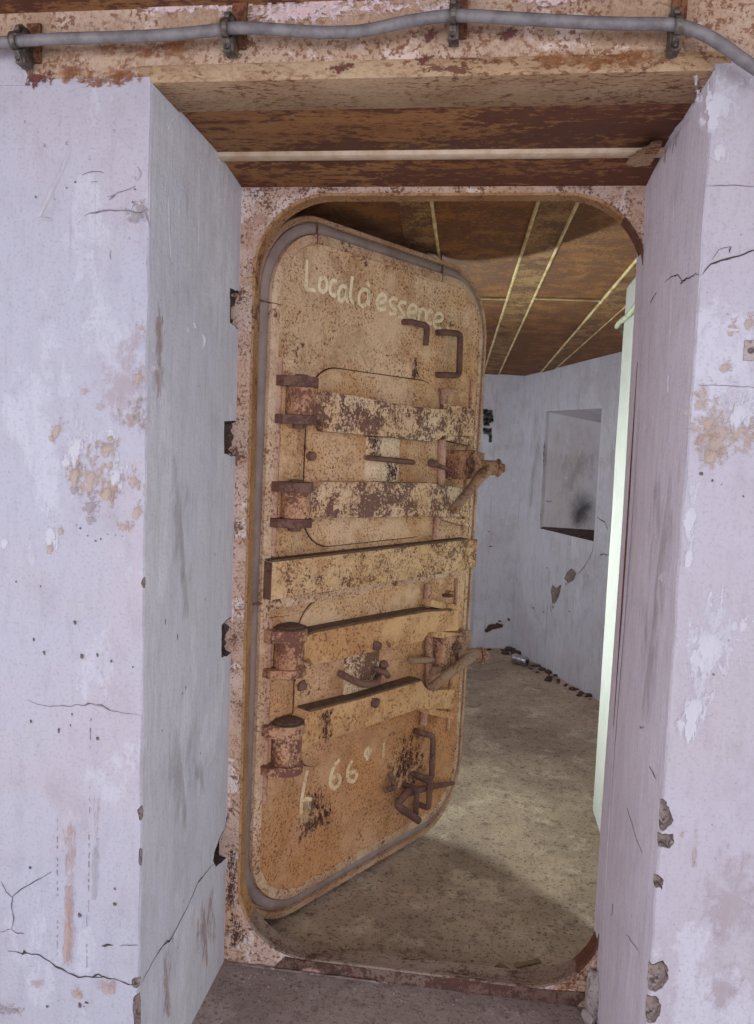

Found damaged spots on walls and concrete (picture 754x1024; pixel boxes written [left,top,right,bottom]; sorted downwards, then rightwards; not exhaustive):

corrosion [59,40,203,87]
corrosion [535,50,667,69]
crack [650,246,754,302]
peeling [49,417,144,542]
peeling [683,386,754,568]
peeling [677,589,754,745]
crack [28,700,137,715]
spalling [657,799,674,848]
crack [1,864,214,985]
spalling [645,961,668,1023]